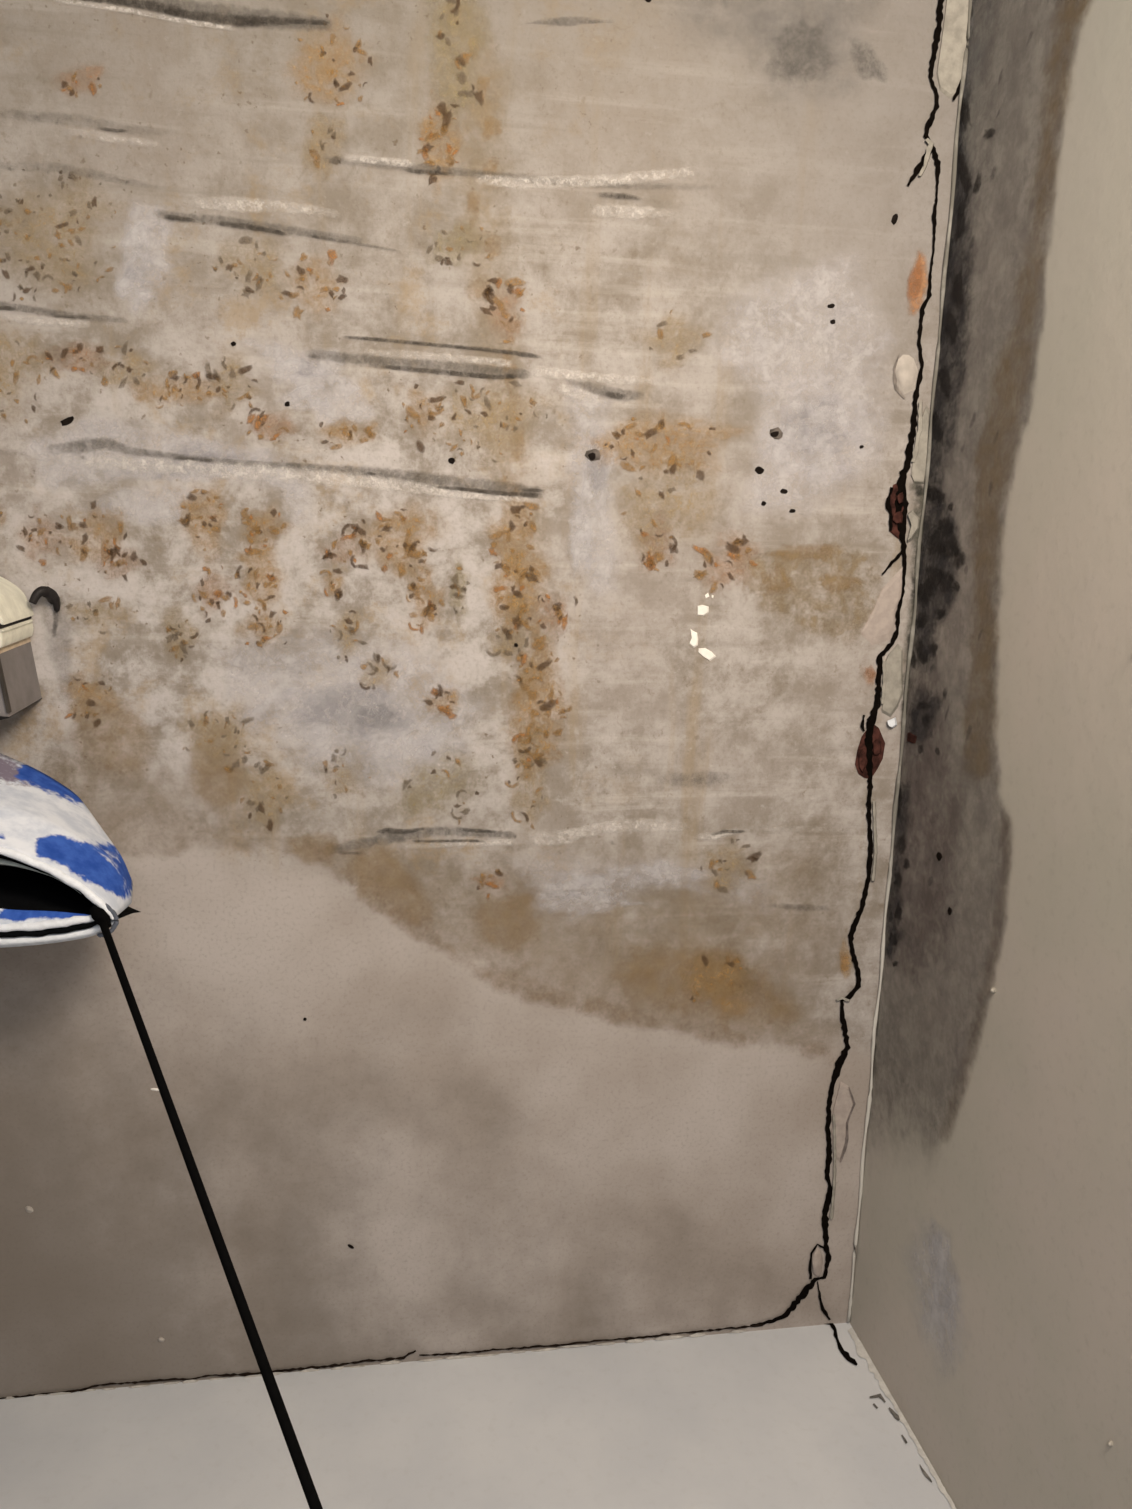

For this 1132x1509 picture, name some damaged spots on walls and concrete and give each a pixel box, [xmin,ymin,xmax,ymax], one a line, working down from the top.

rust [418,0,483,185]
rust [214,237,347,318]
rust [427,227,525,343]
rust [18,501,147,580]
rust [0,339,290,440]
rust [166,490,288,661]
rust [320,509,470,690]
crack [0,0,944,1399]
rust [402,374,548,462]
rust [488,501,578,829]
rust [603,417,757,591]
leakage [873,0,1085,1119]